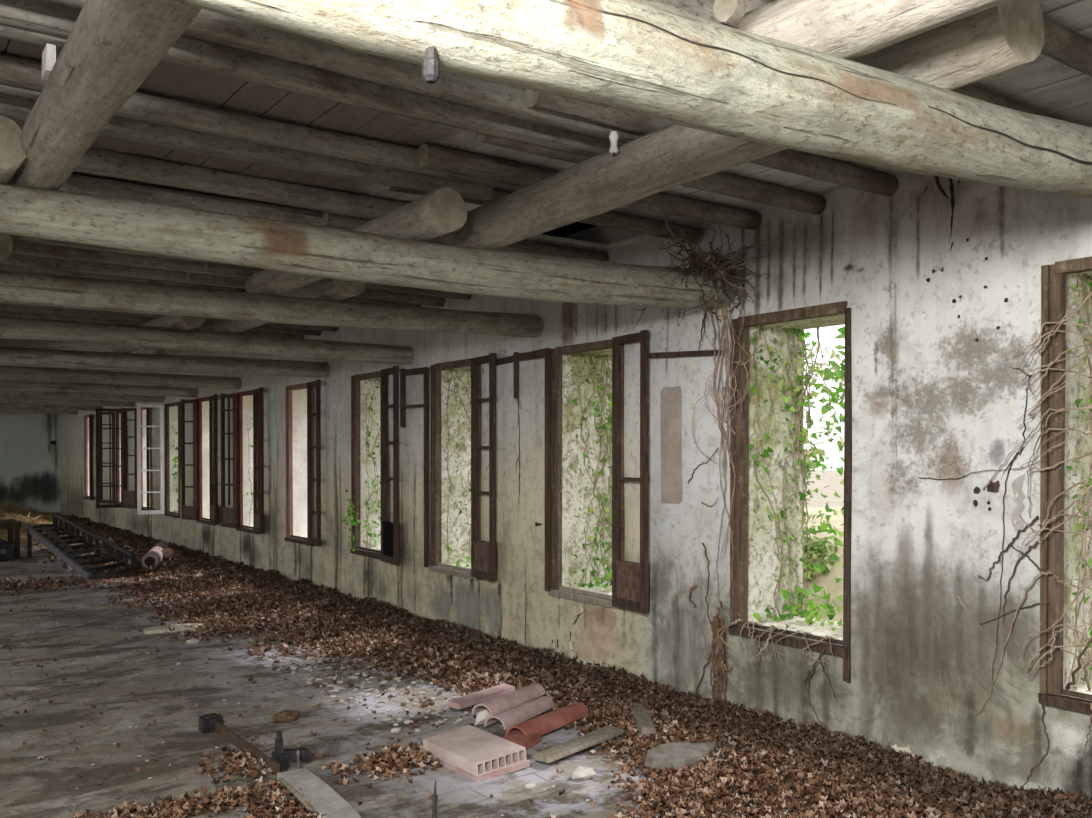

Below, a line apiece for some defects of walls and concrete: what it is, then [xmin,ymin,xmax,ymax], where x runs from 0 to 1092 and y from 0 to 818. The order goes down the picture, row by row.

crack [928,106,1092,165]
damp [742,226,806,312]
damp [874,330,1025,470]
damp [0,475,61,505]
damp [875,574,1020,754]
damp [1010,713,1050,794]
damp [1052,723,1092,798]